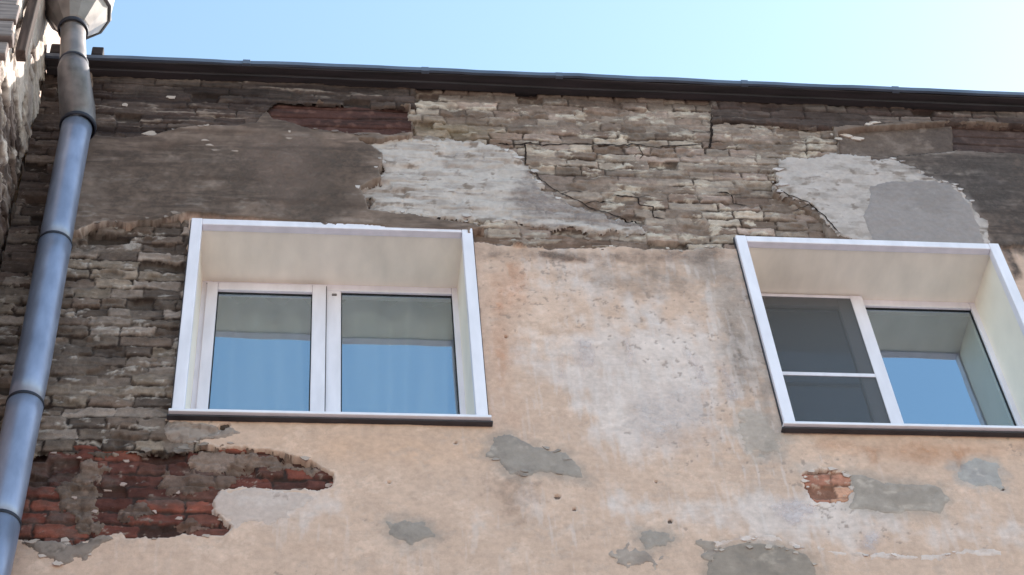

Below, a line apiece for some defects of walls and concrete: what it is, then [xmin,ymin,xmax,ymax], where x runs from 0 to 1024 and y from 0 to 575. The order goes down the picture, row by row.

crack [496,118,713,224]
flaking render [267,89,1024,252]
flaking render [18,211,333,566]
flaking render [801,467,854,506]